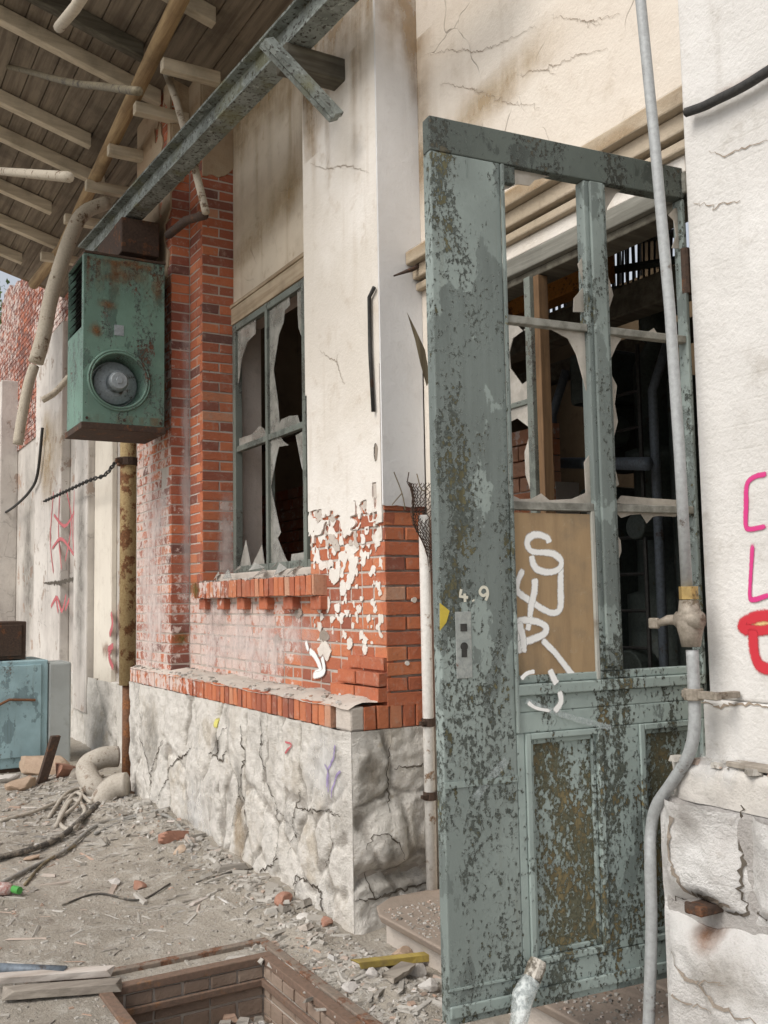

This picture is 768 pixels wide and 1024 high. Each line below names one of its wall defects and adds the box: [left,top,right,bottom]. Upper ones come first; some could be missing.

crack [426,13,619,110]
peeling [137,78,222,178]
crack [709,140,767,158]
peeling [143,178,184,286]
peeling [294,483,384,661]
crack [139,716,340,910]
crack [358,745,426,902]
crack [667,805,767,921]
crack [670,951,756,1024]